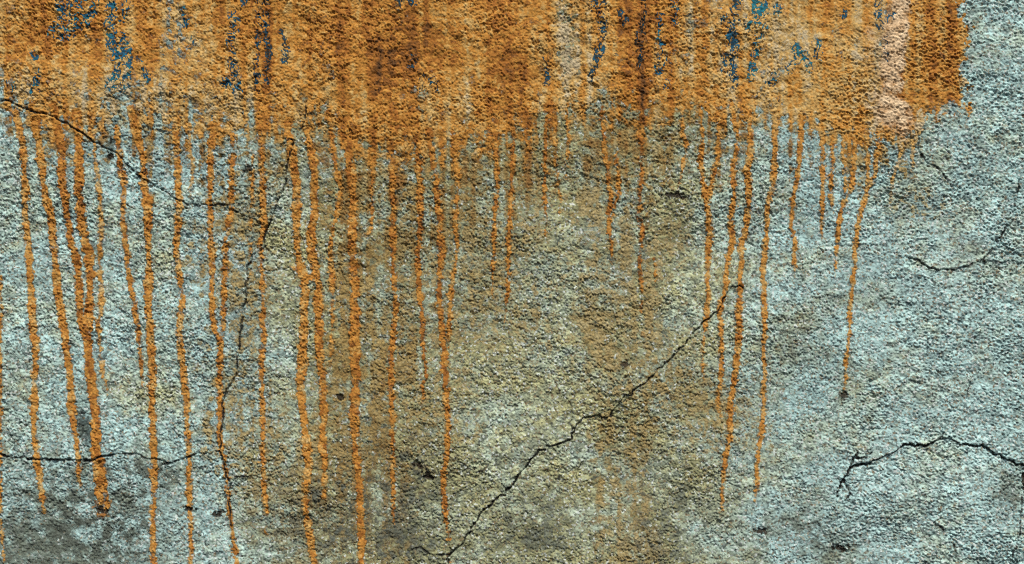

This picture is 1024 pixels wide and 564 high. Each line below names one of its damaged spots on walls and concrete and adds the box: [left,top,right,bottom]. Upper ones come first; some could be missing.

rust [95,181,105,266]
rust [94,285,106,356]
crack [0,99,307,544]
rust [219,206,234,331]
rust [291,265,329,564]
rust [431,172,461,541]
crack [408,285,744,563]
rust [696,139,715,373]
rust [715,143,746,416]
rust [819,164,834,238]
crack [837,433,1024,499]
crack [911,182,1024,271]